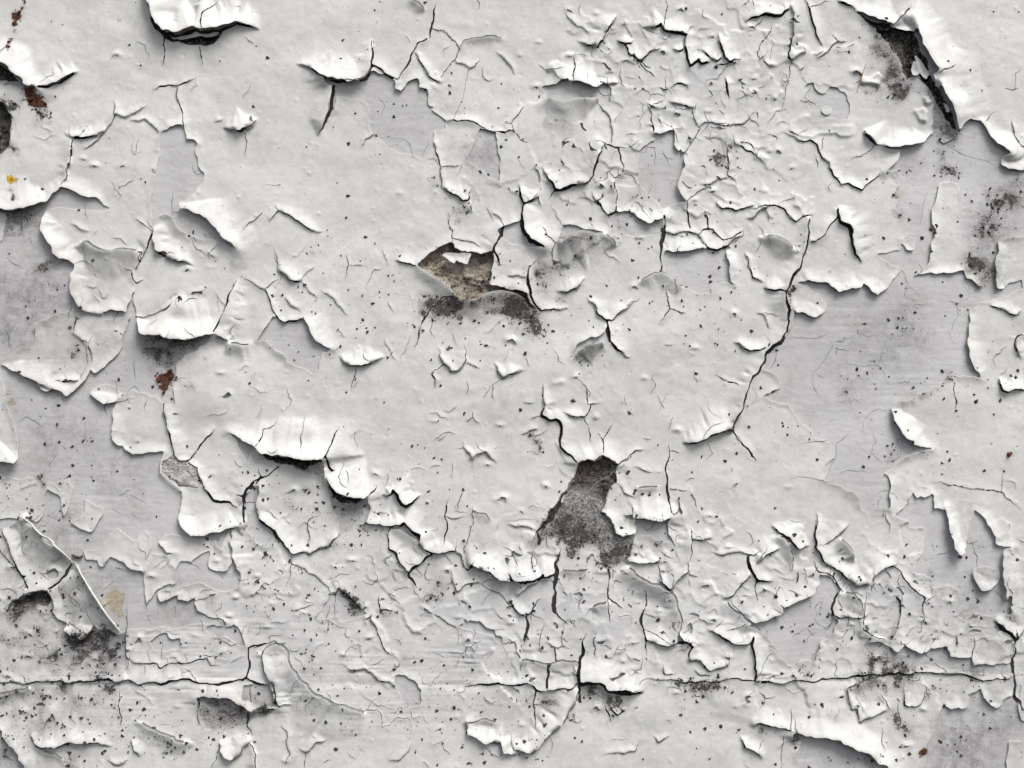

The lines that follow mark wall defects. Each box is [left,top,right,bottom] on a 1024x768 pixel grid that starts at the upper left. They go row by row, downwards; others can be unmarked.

rust [21,84,52,119]
crack [42,0,260,196]
crack [296,0,529,146]
crack [742,0,880,191]
crack [67,198,417,343]
peeling [442,253,471,264]
crack [519,183,620,264]
crack [543,2,769,358]
rust [154,369,178,395]
crack [163,197,1024,762]
peeling [526,440,687,571]
crack [0,519,430,768]